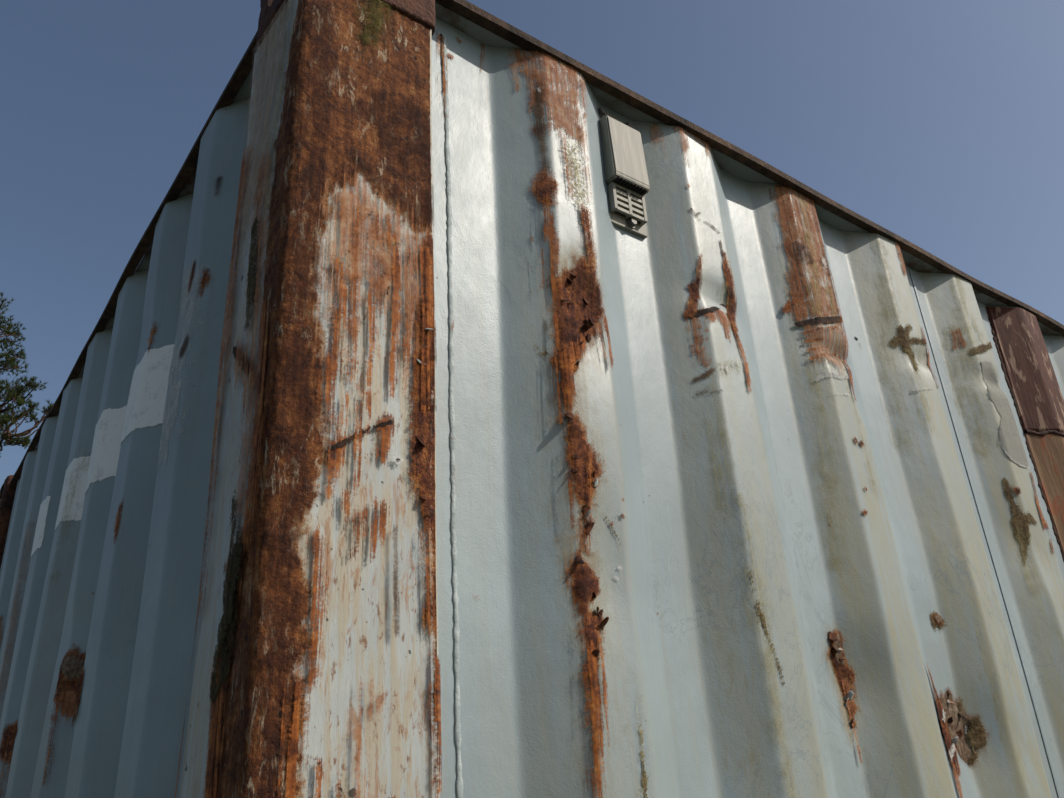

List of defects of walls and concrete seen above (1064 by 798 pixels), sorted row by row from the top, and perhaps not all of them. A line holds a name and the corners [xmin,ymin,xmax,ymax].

corrosion [188,261,210,296]
corrosion [684,252,752,392]
corrosion [769,185,856,399]
corrosion [194,0,442,798]
corrosion [509,48,614,798]
corrosion [1001,472,1055,565]
corrosion [0,720,18,797]
corrosion [42,644,86,785]
corrosion [827,630,863,763]